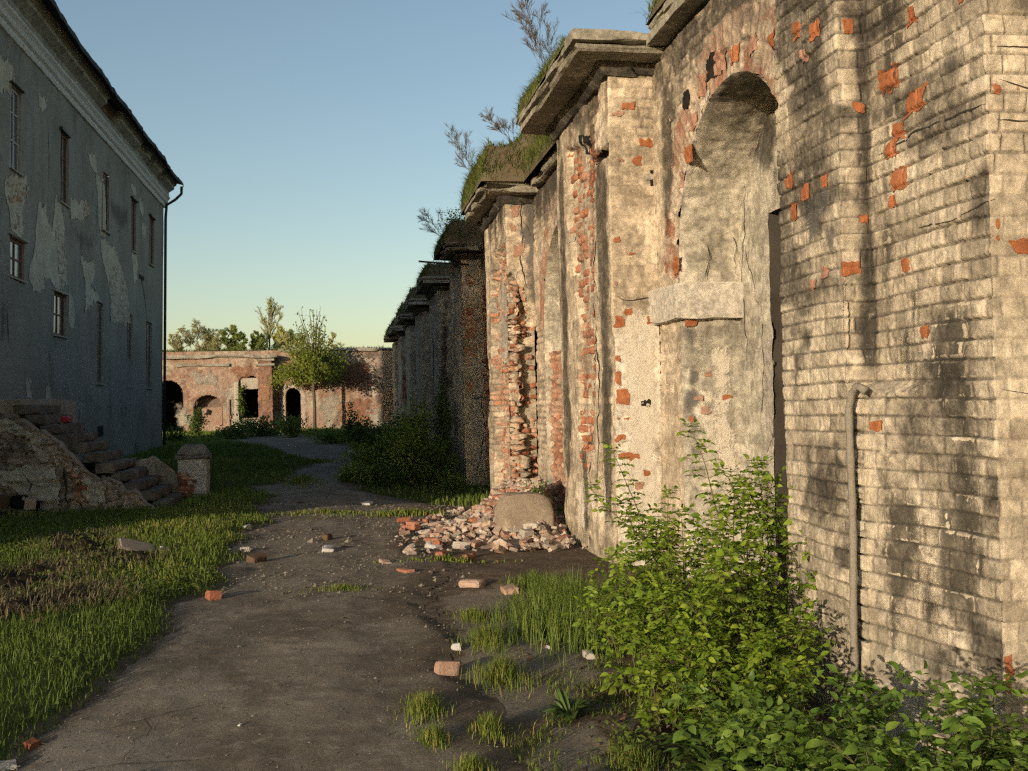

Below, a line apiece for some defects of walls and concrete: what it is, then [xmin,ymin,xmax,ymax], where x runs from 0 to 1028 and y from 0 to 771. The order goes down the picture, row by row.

peeling [0,55,15,97]
water stain [882,0,903,133]
spalling [878,62,929,209]
peeling [4,146,138,328]
peeling [488,243,534,365]
spalling [567,135,653,473]
water stain [929,310,982,639]
water stain [881,498,918,648]
crack [78,705,240,771]